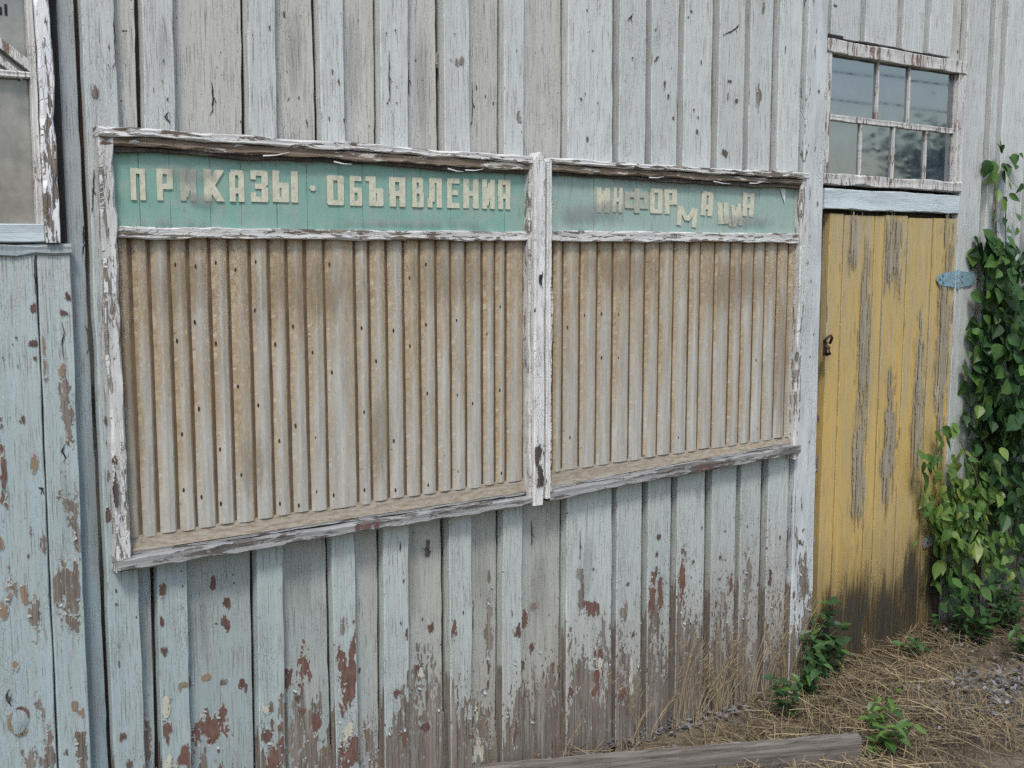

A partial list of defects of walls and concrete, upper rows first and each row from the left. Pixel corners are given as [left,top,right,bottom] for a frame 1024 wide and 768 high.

peeling [12,328,75,476]
peeling [0,415,8,522]
peeling [535,444,544,488]
peeling [0,564,42,643]
peeling [27,488,83,641]
peeling [209,576,231,633]
peeling [254,528,815,768]
leakage [819,542,941,666]
peeling [20,690,88,768]
peeling [111,673,248,768]